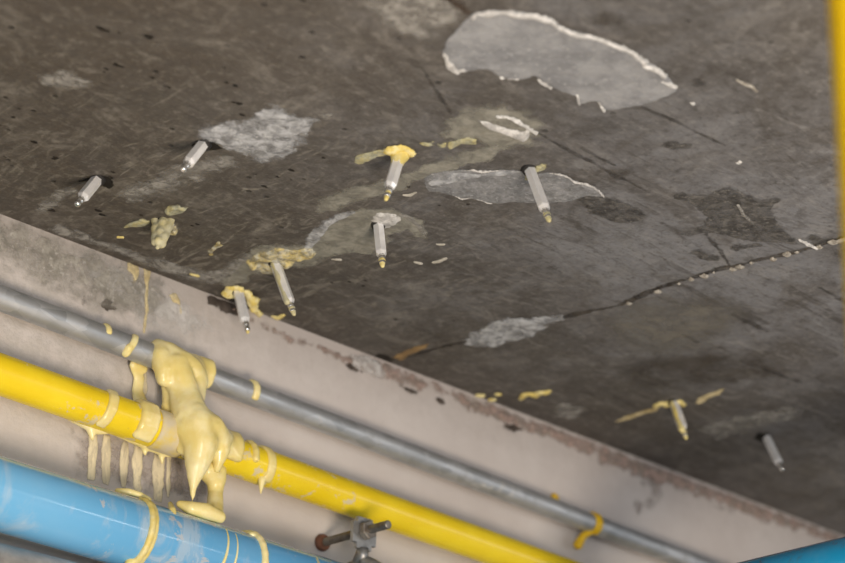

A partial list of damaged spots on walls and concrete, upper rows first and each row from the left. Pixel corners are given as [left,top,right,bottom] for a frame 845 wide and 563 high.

peeling [442,10,678,113]
peeling [441,107,543,150]
peeling [424,169,536,205]
peeling [537,172,645,223]
crack [539,234,843,324]
rust [393,344,428,360]
crack [391,340,478,361]